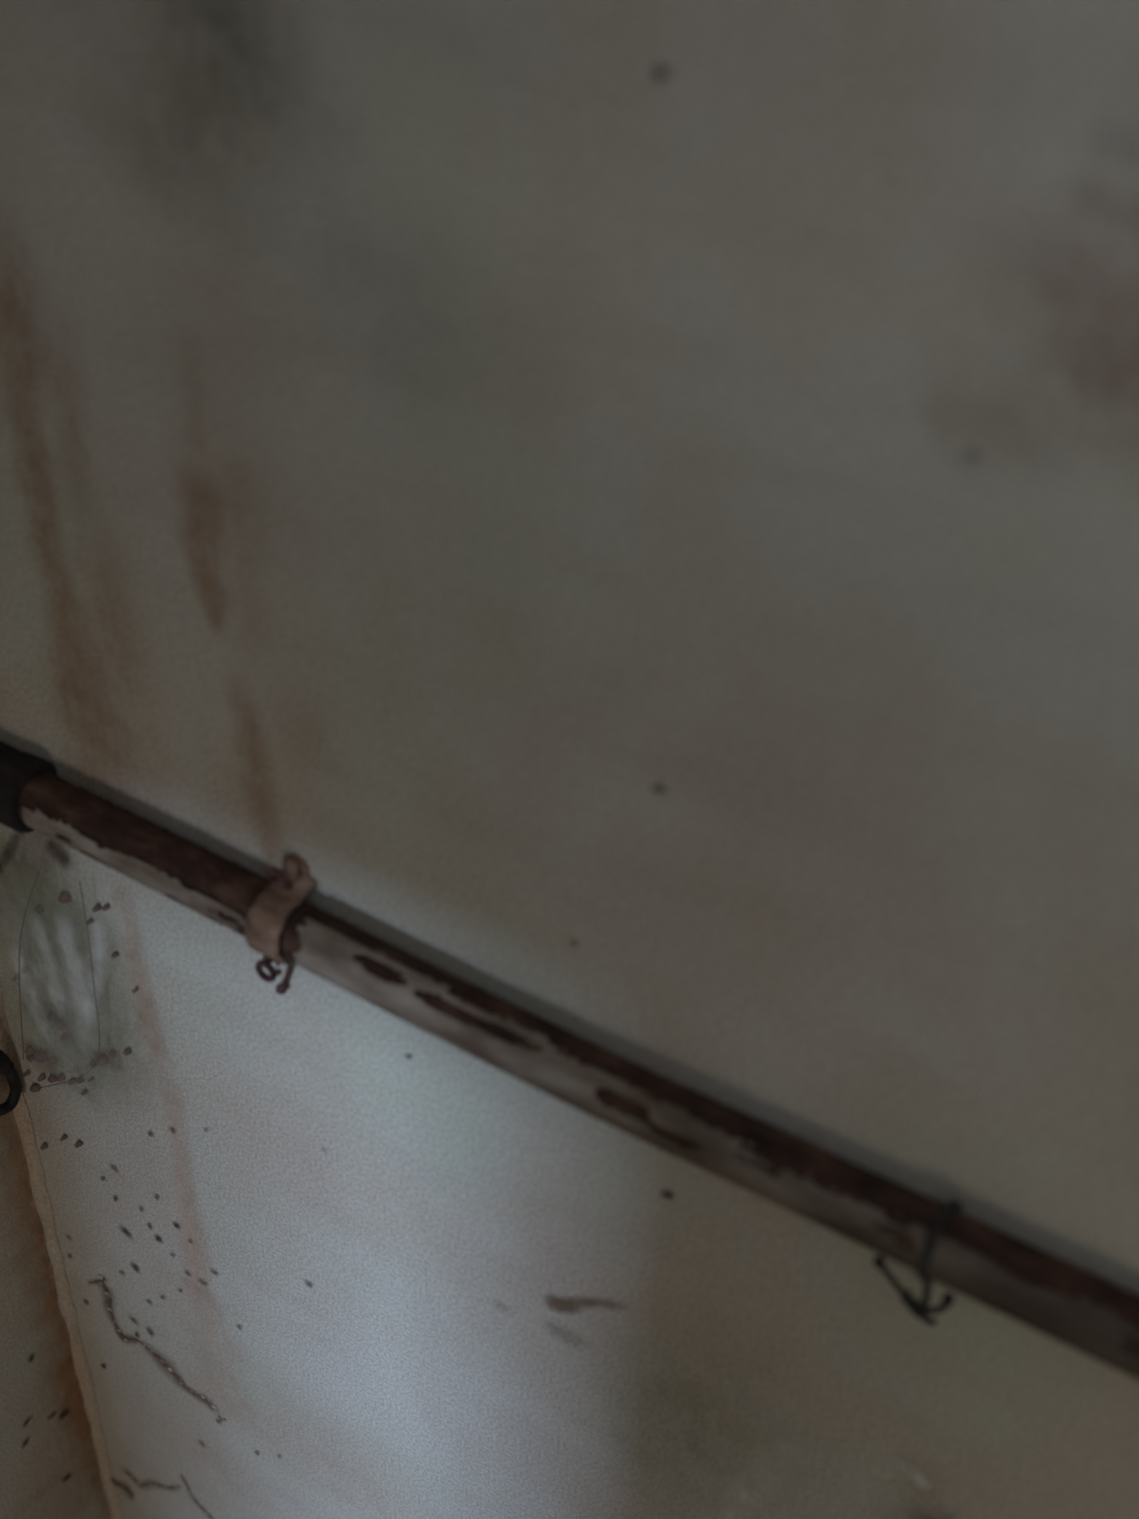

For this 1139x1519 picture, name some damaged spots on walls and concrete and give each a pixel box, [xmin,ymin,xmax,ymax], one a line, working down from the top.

rust [22,772,271,906]